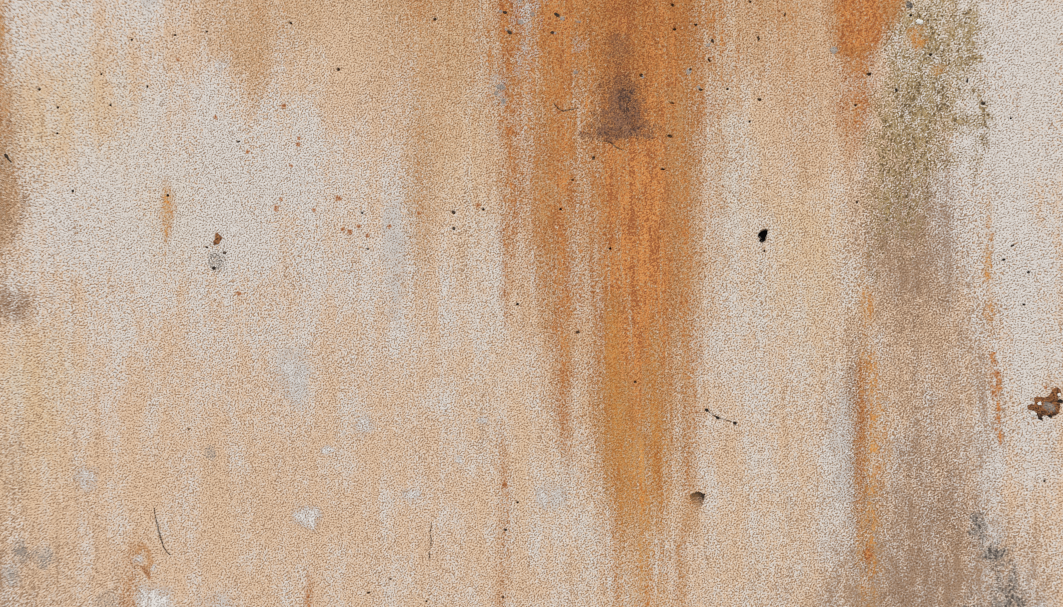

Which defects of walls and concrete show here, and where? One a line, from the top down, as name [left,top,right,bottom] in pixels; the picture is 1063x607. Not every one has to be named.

corrosion [832,0,904,144]
corrosion [464,0,739,607]
corrosion [1027,386,1063,421]